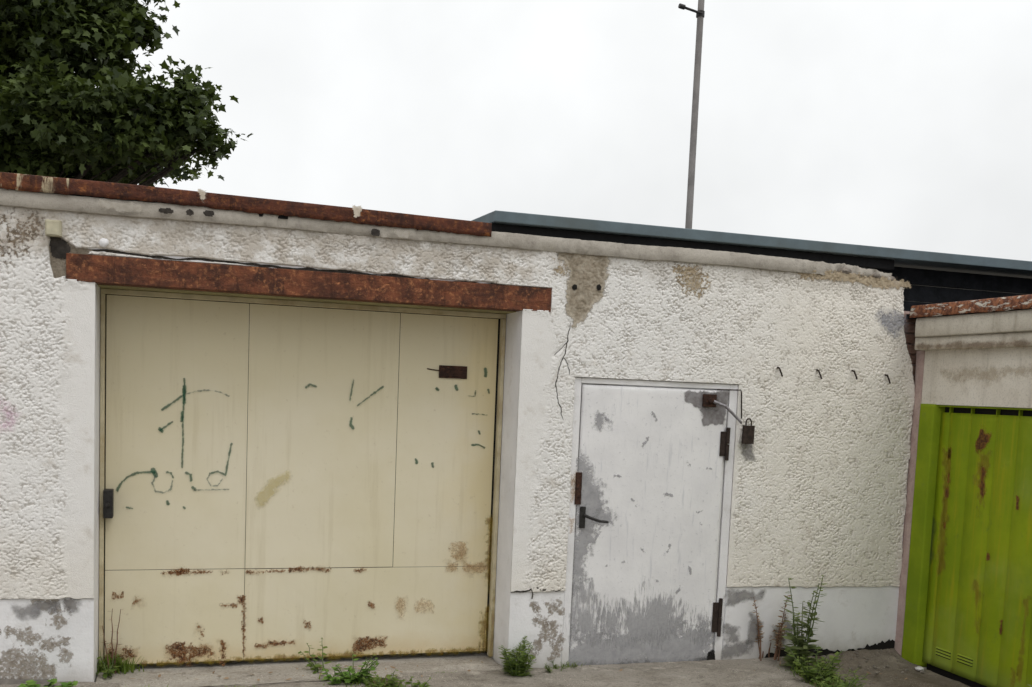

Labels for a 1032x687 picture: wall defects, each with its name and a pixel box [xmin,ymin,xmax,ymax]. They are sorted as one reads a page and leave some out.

flaking render [554,253,610,328]
flaking render [673,264,712,298]
crack [555,323,571,418]
corrosion [975,429,991,451]
corrosion [162,568,227,576]
peeling [529,453,715,666]
peeling [0,598,75,679]
corrosion [166,626,227,666]
corrosion [222,595,294,658]
corrosion [352,636,387,653]